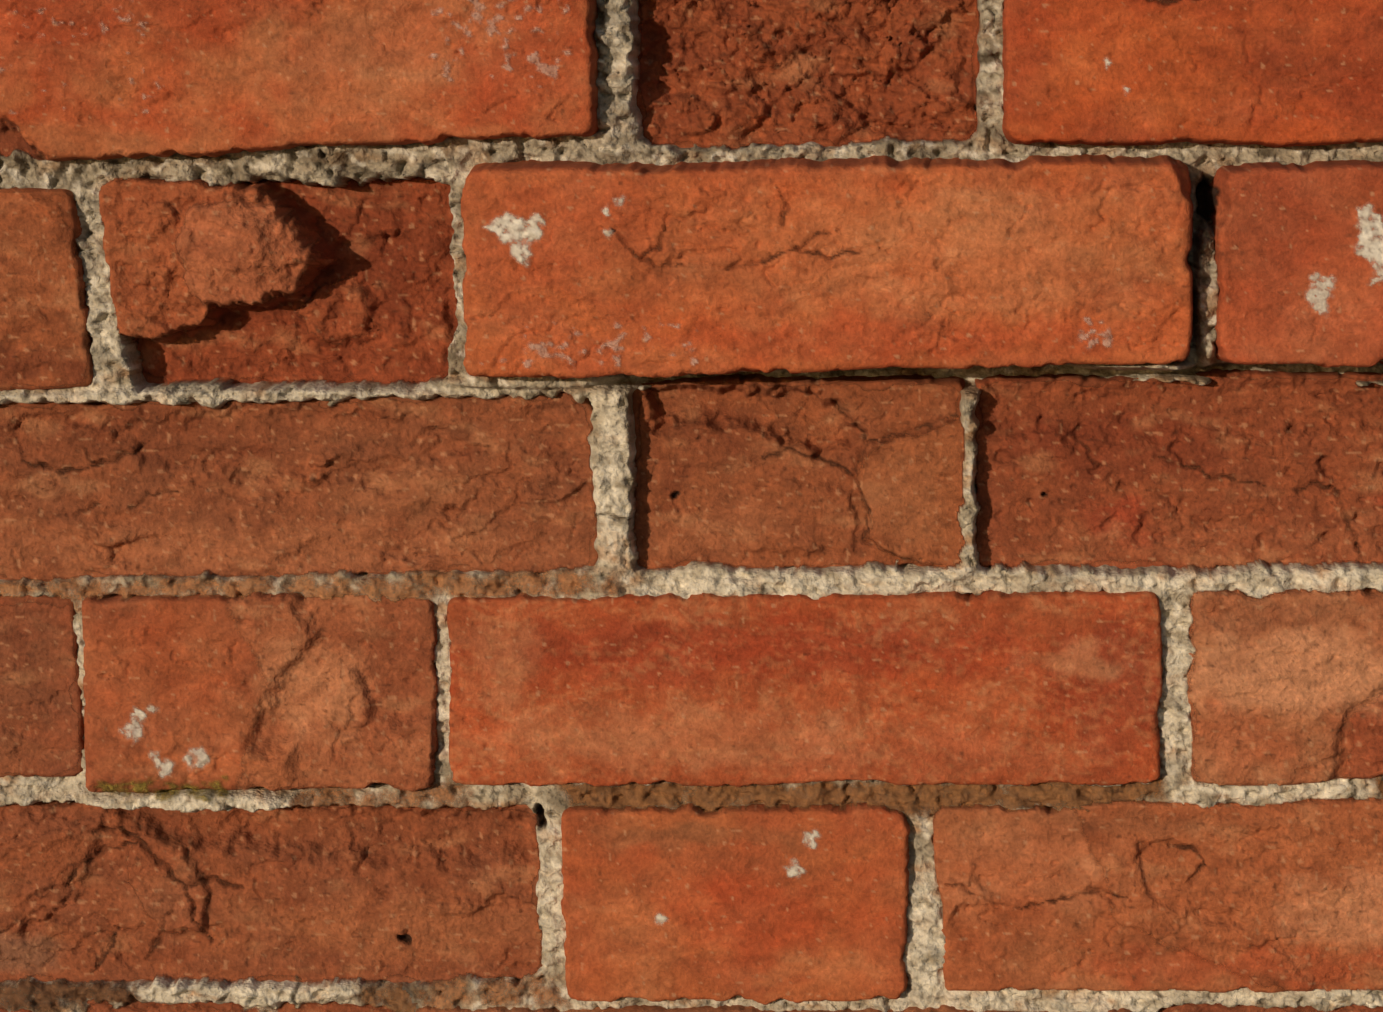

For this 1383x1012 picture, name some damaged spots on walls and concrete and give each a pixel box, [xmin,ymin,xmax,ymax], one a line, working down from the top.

spalling [0,118,45,160]
spalling [636,0,979,149]
crack [750,400,958,554]
spalling [633,376,1383,570]
spalling [0,177,596,985]
spalling [1075,588,1383,1012]
crack [93,927,120,972]
crack [67,826,244,953]
spalling [88,1001,393,1012]